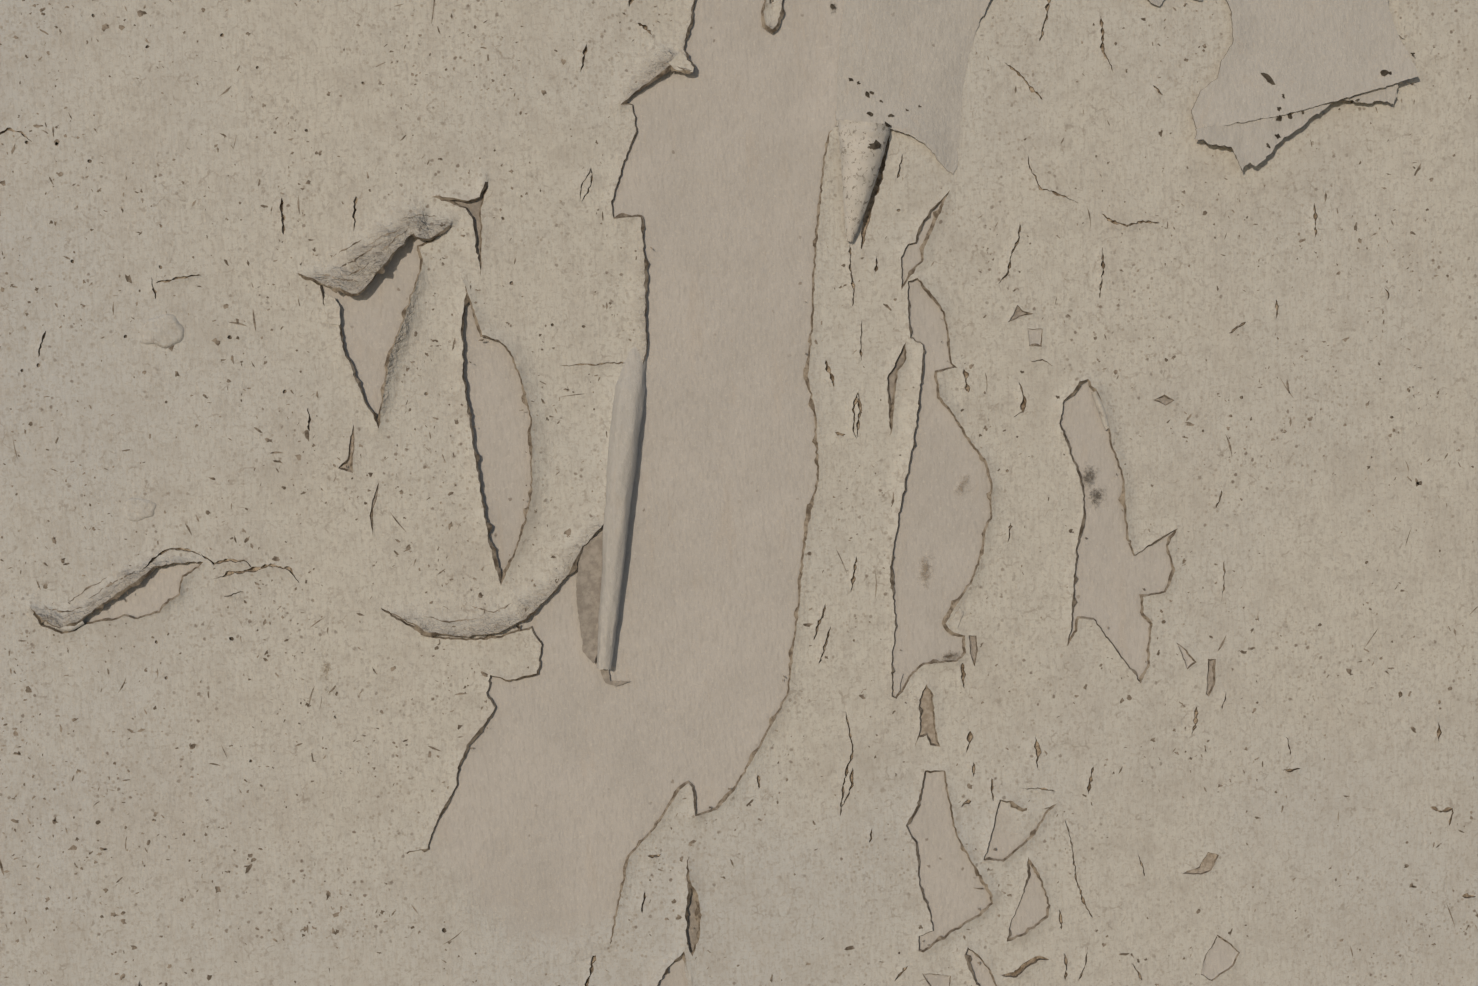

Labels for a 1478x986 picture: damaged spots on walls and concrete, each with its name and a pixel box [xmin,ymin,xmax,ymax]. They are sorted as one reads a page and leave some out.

peeling [1191,0,1420,170]
peeling [288,0,1063,986]
peeling [1045,367,1186,692]
peeling [15,542,215,642]
peeling [1177,643,1216,696]
peeling [1183,852,1219,875]
peeling [1201,935,1240,981]